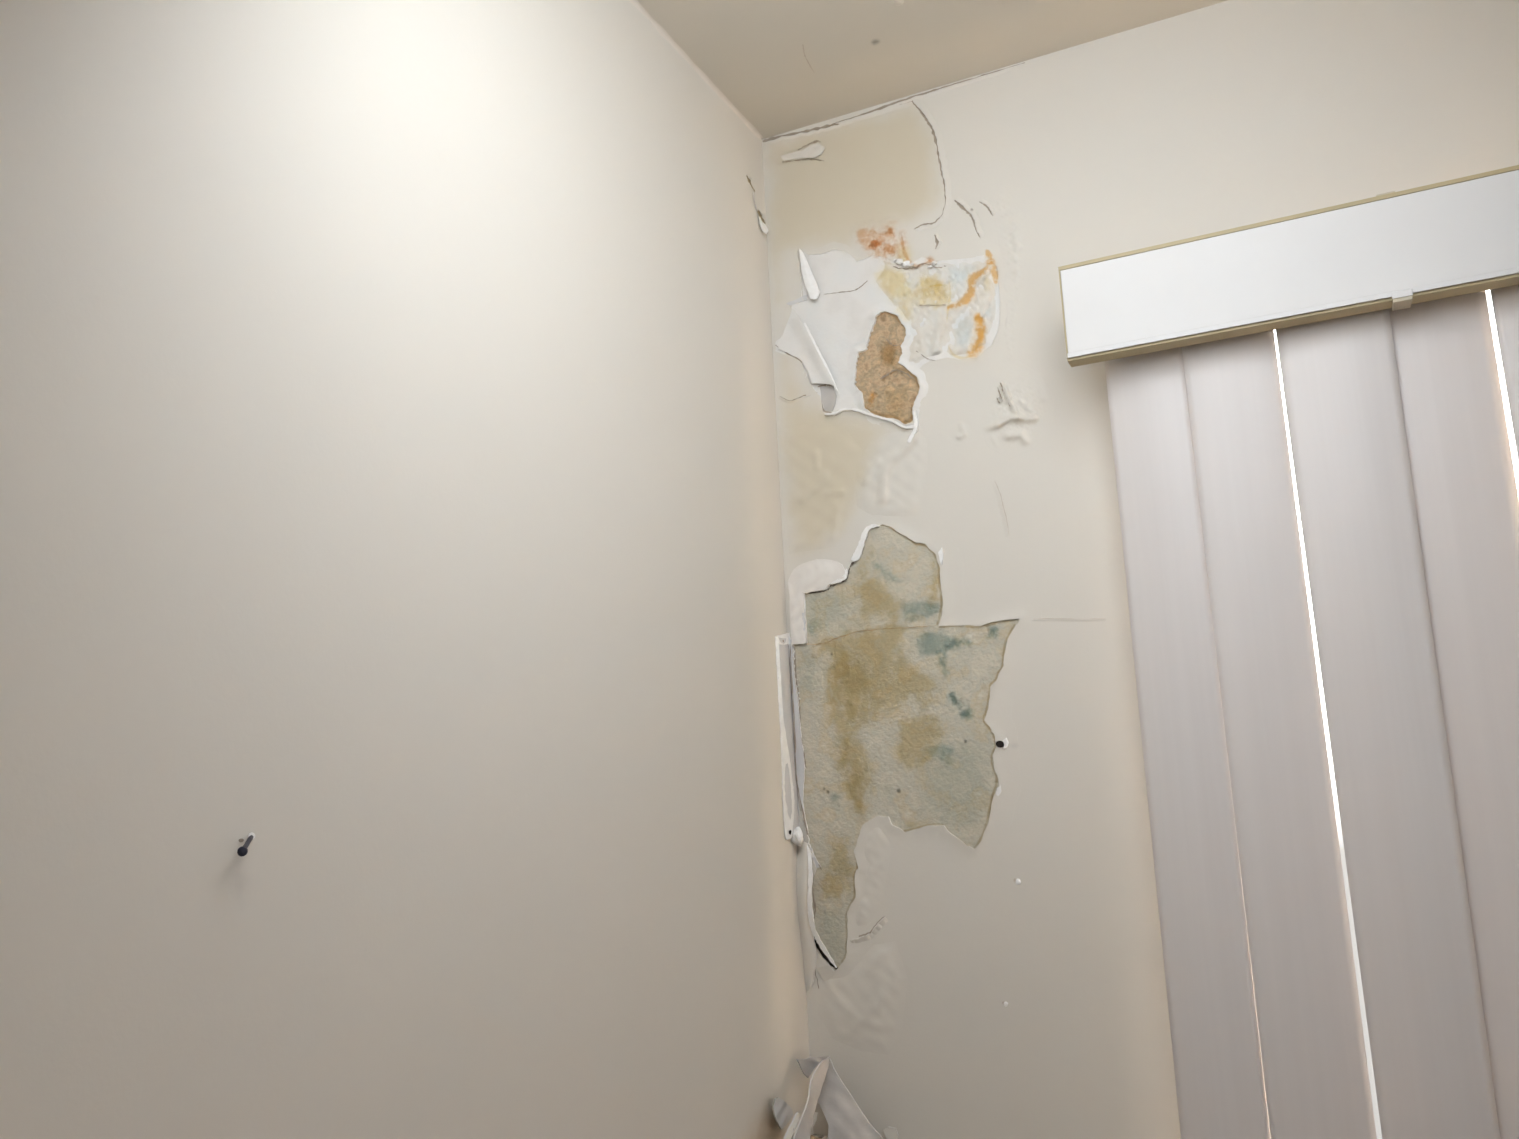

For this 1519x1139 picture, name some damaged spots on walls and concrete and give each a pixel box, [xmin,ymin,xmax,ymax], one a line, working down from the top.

peeling [746,174,769,234]
crack [763,62,1026,250]
peeling [773,234,1016,443]
peeling [788,509,1042,993]